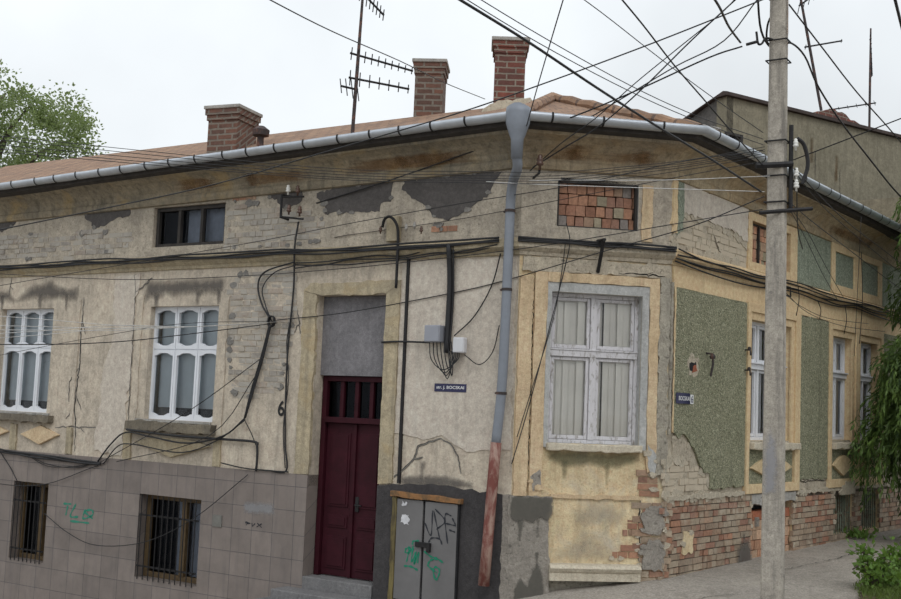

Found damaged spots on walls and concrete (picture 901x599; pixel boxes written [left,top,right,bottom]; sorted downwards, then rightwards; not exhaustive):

flaking render [83,210,131,230]
flaking render [224,171,502,250]
flaking render [669,212,747,268]
damp [24,284,76,302]
damp [147,281,223,304]
flaking render [609,435,753,582]